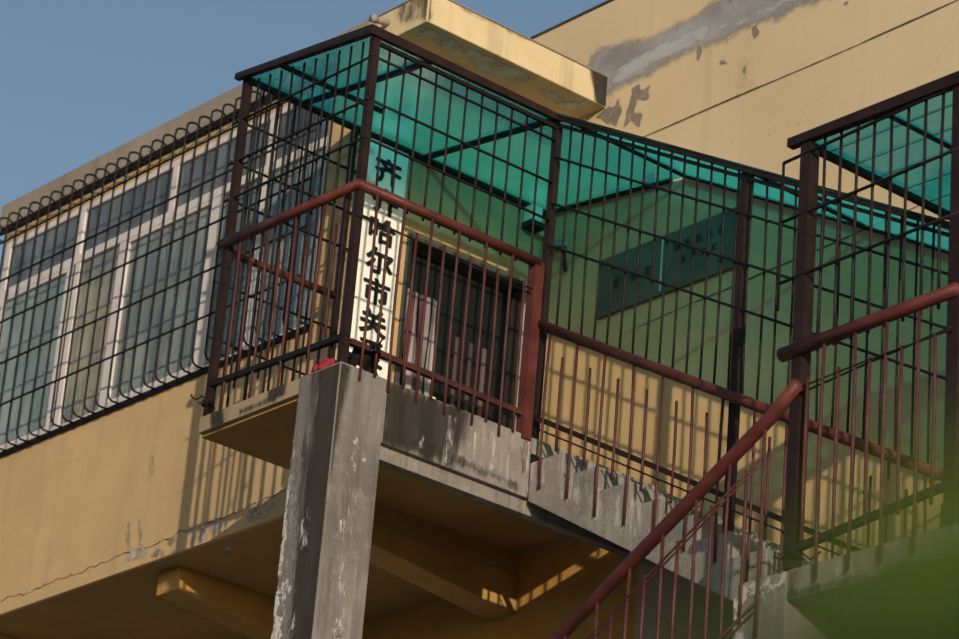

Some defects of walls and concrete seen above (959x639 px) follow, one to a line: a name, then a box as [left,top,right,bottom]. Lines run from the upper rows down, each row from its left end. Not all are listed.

peeling [597,84,650,126]
leakage [383,383,476,467]
leakage [479,431,530,491]
crack [0,490,285,602]
peeling [247,433,310,639]
peeling [333,489,363,639]